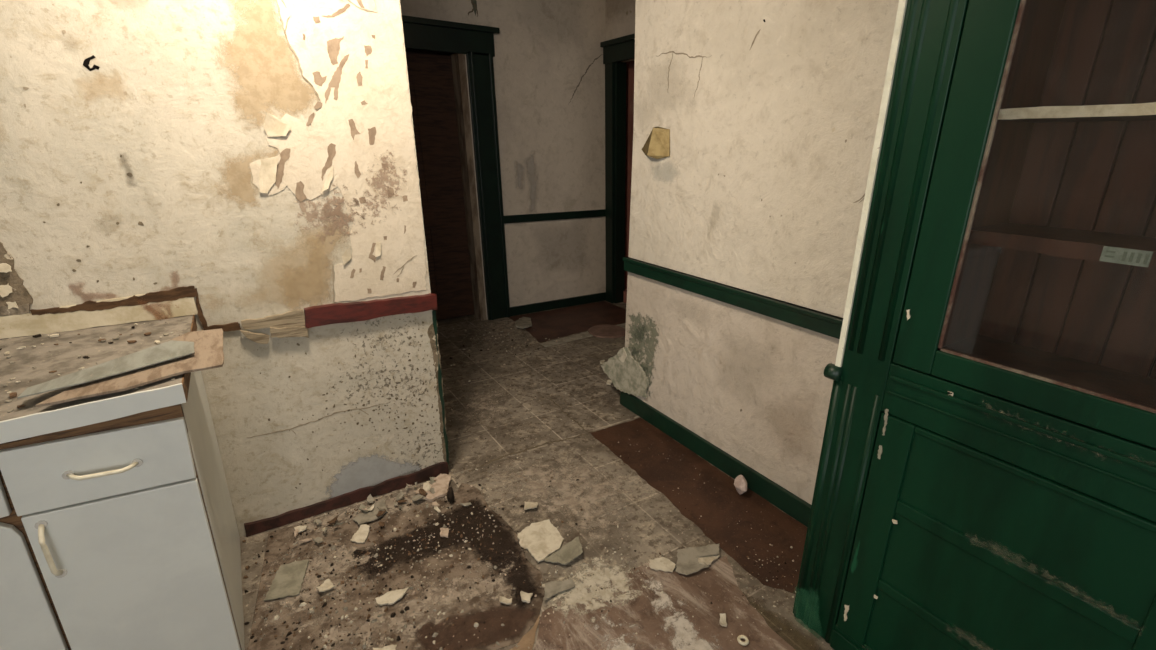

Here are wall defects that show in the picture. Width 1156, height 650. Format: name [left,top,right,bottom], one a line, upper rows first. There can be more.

damp [225,0,317,126]
crack [657,51,712,96]
damp [224,157,255,203]
peeling [250,0,426,302]
flaking render [0,242,33,309]
damp [248,313,715,650]